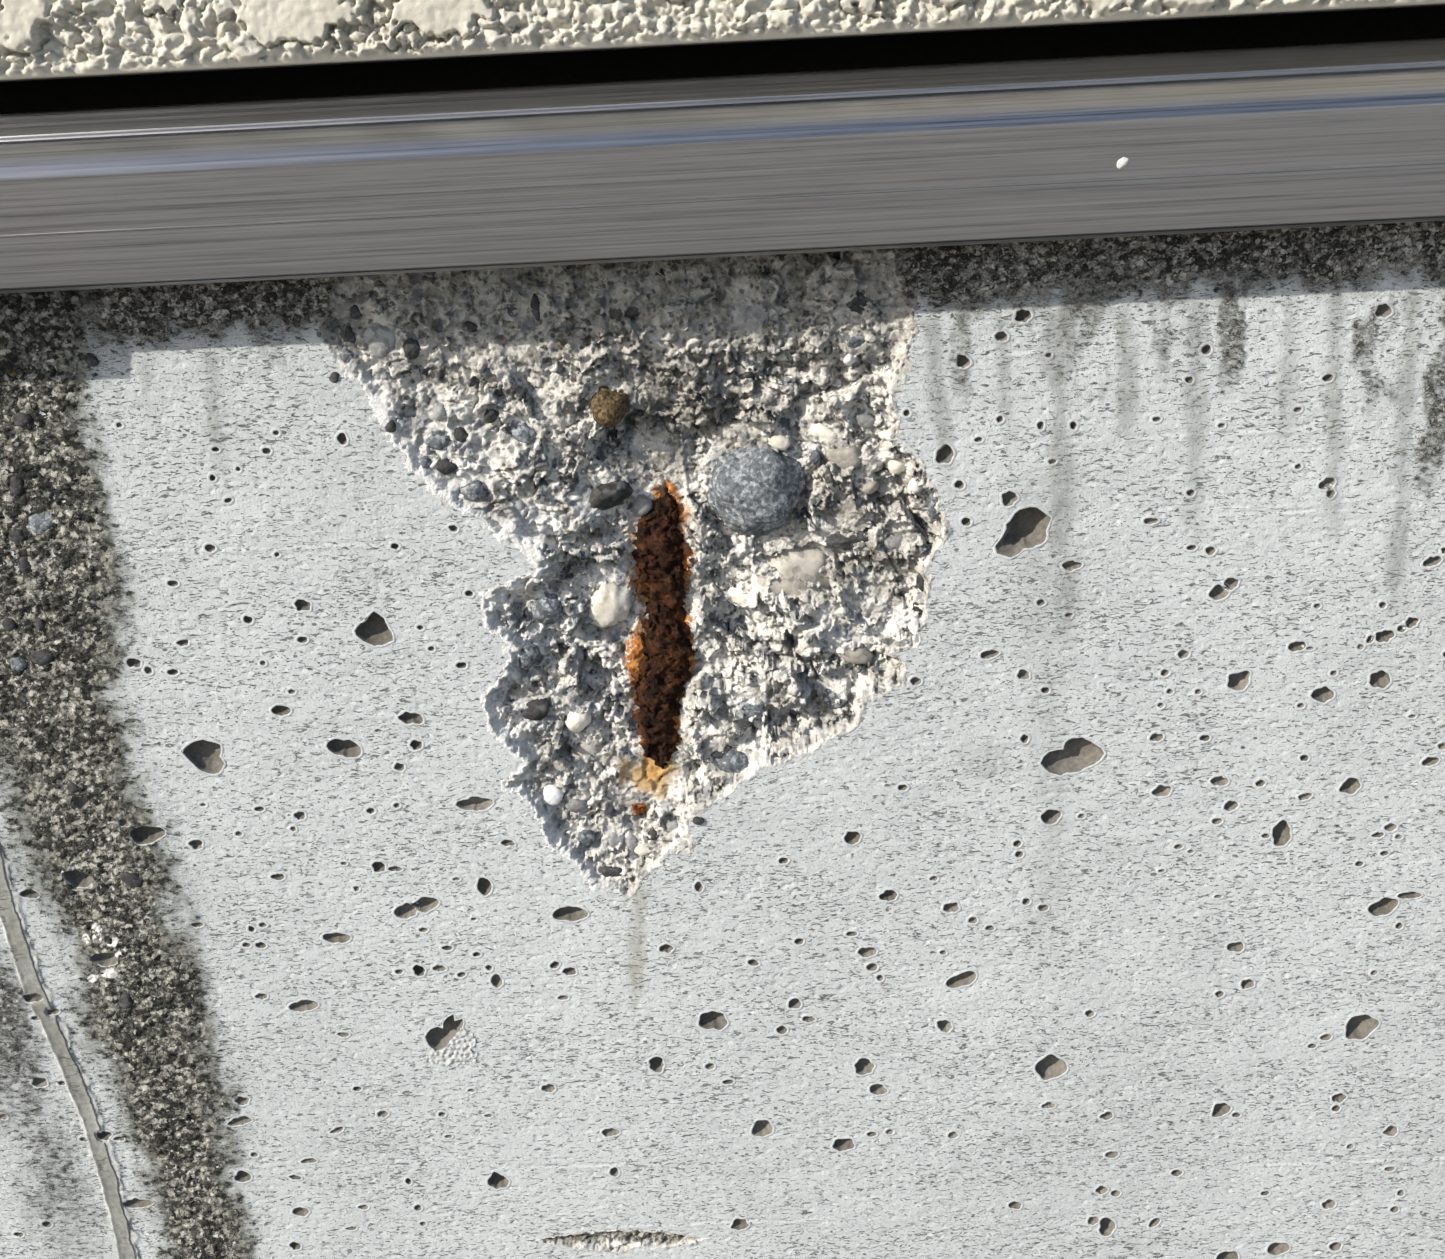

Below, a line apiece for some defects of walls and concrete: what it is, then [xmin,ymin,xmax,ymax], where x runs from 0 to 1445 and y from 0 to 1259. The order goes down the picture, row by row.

water stain [949,304,973,409]
water stain [1058,282,1112,376]
water stain [1151,320,1177,391]
water stain [1216,276,1253,393]
water stain [1349,294,1400,412]
water stain [1412,310,1445,497]
spalling [316,248,954,898]
corrosion [619,476,698,815]
water stain [0,290,267,1259]